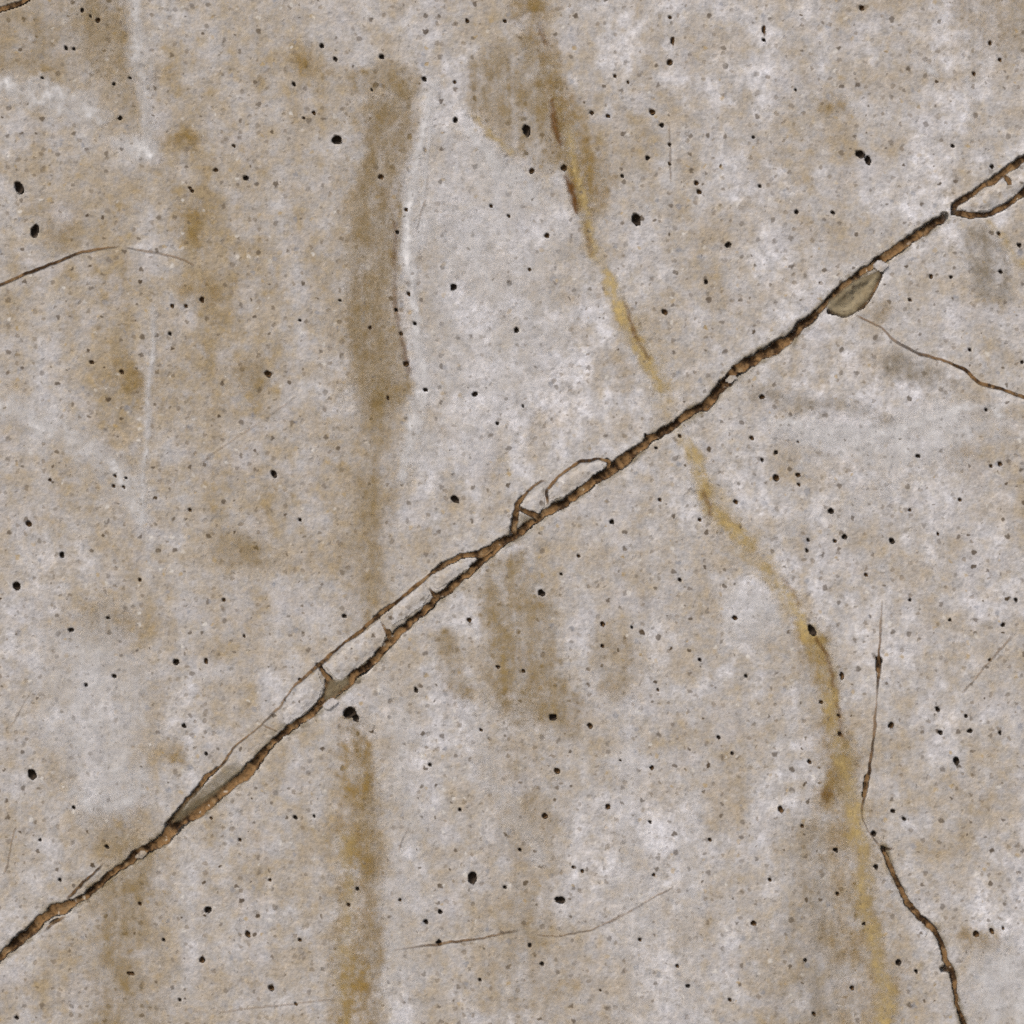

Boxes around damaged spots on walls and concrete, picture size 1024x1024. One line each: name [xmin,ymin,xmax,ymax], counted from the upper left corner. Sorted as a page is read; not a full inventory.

corrosion [551,99,596,257]
water stain [373,81,438,480]
corrosion [603,269,662,391]
crack [0,156,1024,960]
corrosion [685,446,752,546]
corrosion [782,591,838,730]
crack [882,844,967,1024]